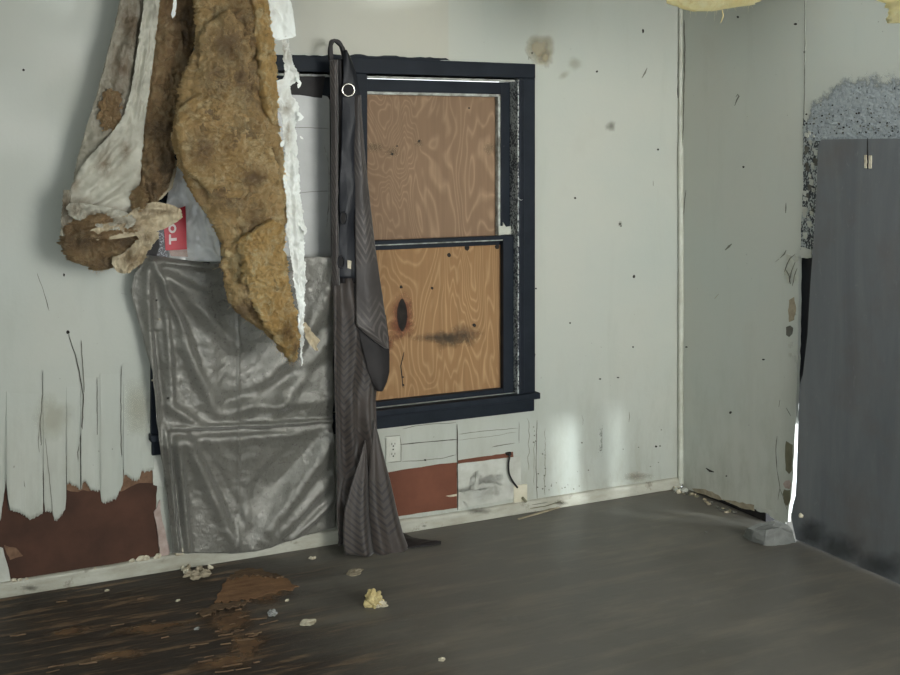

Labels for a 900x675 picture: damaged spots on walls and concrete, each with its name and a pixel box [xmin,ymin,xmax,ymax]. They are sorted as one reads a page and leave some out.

peeling [0,373,185,582]
peeling [388,452,513,516]